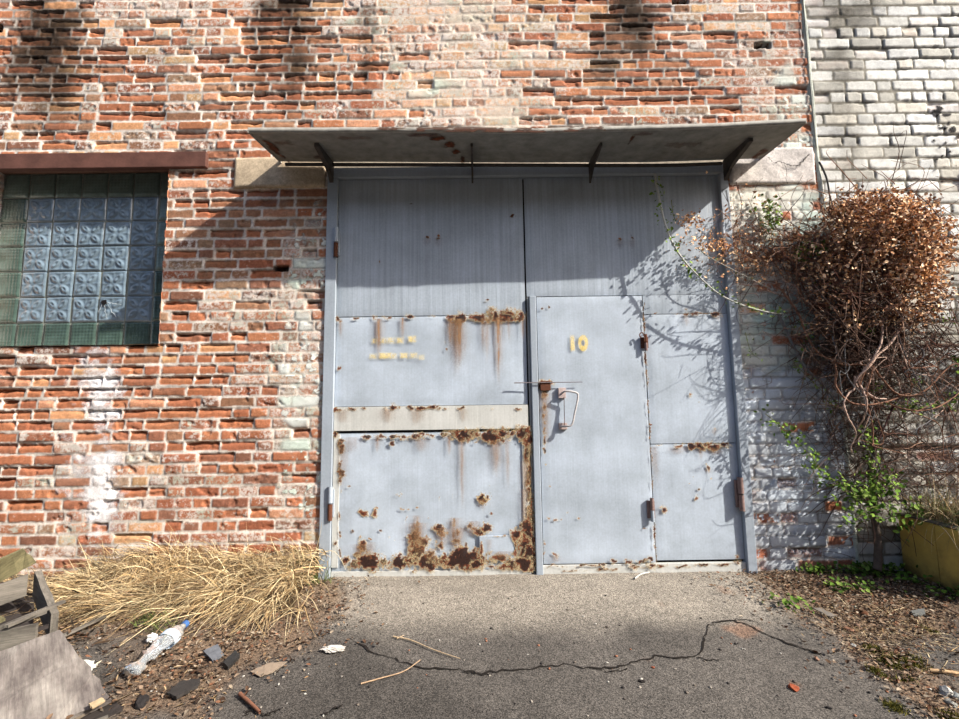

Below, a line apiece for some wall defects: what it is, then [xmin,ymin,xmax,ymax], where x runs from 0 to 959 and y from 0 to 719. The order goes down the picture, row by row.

rust [373,315,414,345]
rust [434,299,524,368]
efflorescence [64,349,127,535]
rust [333,379,739,573]
crack [358,619,821,676]